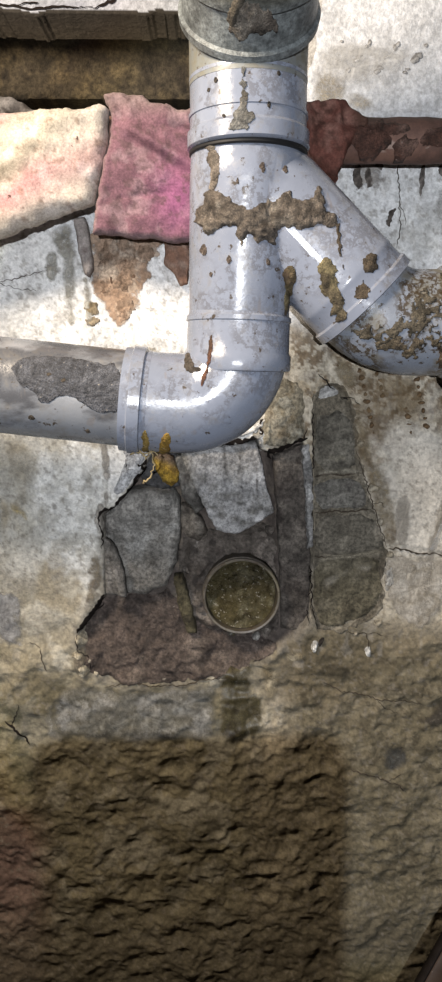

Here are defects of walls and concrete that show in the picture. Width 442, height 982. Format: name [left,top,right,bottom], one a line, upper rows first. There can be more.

crack [0,0,116,10]
peeling [84,233,164,327]
flaking render [238,422,263,451]
flaking render [309,383,394,653]
crack [356,451,442,556]
flaking render [54,451,280,741]
crack [5,705,30,745]